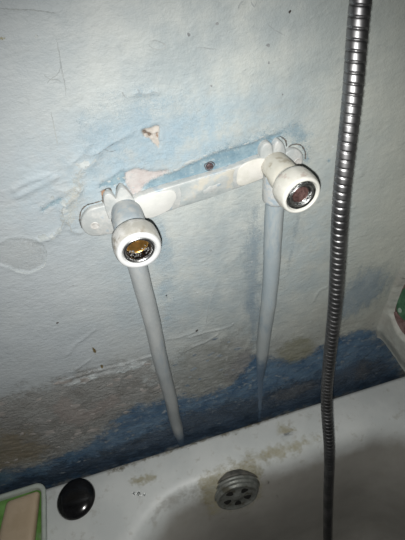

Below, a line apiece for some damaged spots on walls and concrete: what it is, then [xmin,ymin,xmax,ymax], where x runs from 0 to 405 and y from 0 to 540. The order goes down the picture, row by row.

peeling [99,120,313,194]
water stain [332,354,404,398]
water stain [0,369,322,494]
water stain [191,436,321,521]